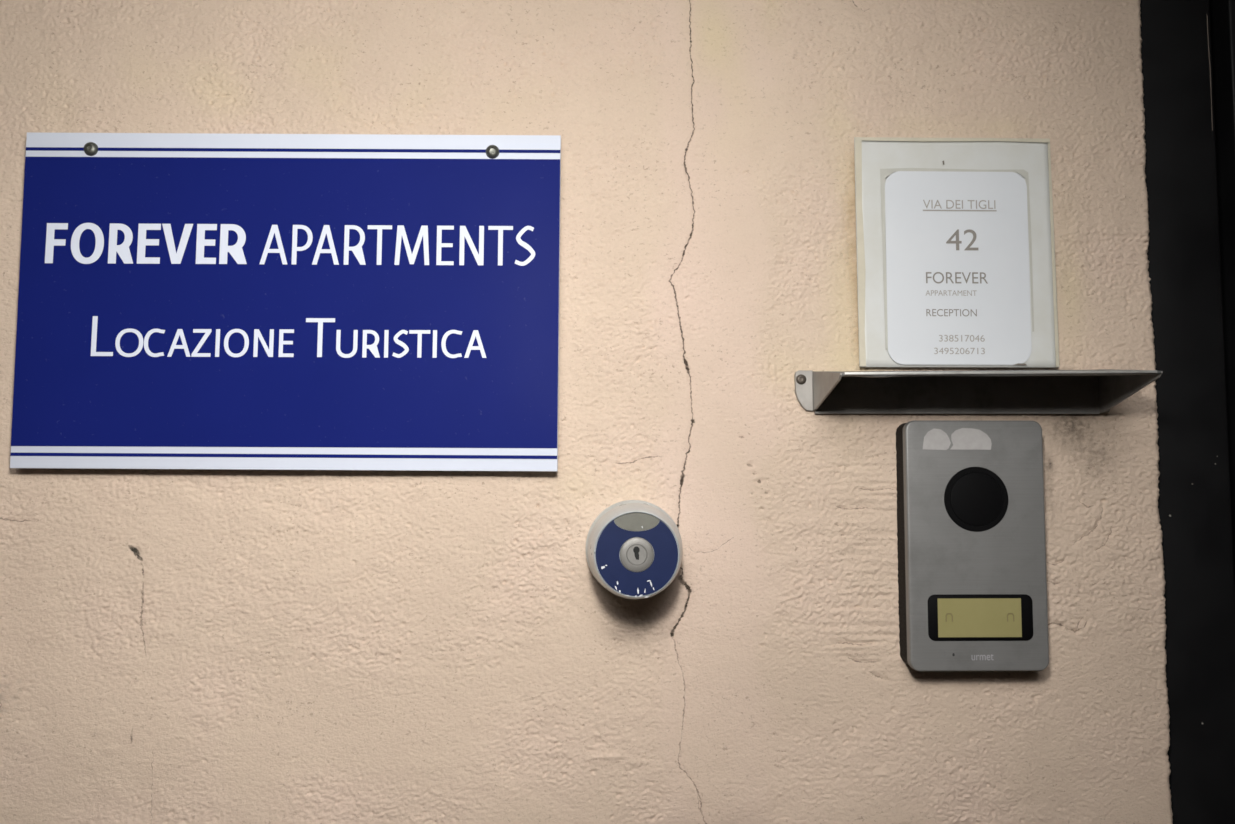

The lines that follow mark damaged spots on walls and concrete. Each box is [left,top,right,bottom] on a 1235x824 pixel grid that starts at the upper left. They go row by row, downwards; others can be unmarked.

crack [669,0,731,654]